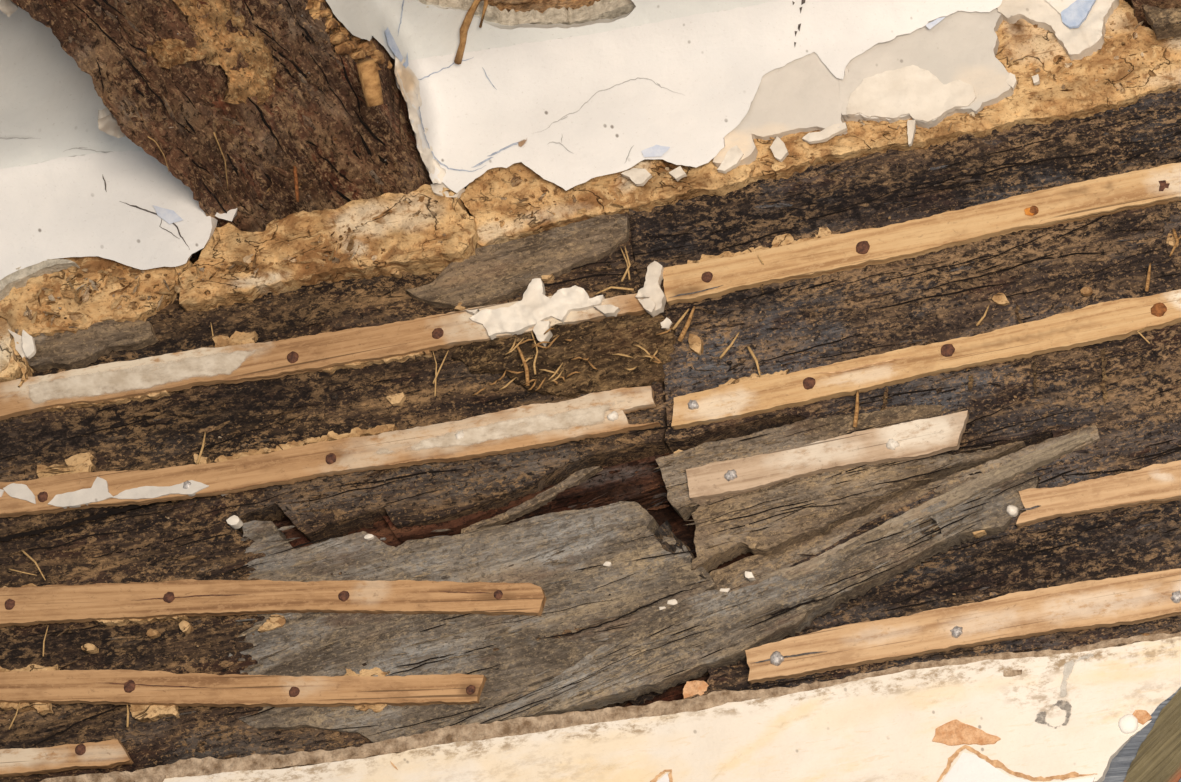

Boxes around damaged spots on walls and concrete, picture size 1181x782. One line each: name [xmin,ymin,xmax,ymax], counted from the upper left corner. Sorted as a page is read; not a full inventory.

spalling [409,0,635,26]
peeling [43,0,401,216]
spalling [385,27,465,199]
spalling [713,8,1017,174]
flaking render [621,145,670,186]
flaking render [669,166,687,182]
spalling [0,259,80,301]
flaking render [22,330,36,359]
peeling [660,297,801,385]
peeling [226,515,243,529]
peeling [932,719,1031,782]
peeling [1123,688,1181,782]